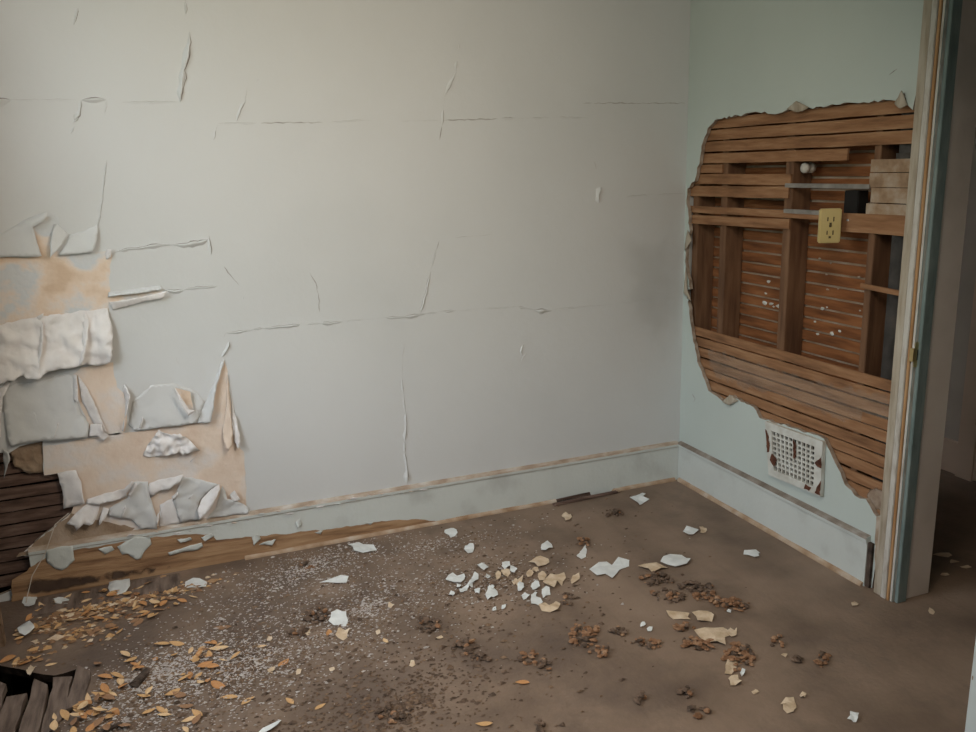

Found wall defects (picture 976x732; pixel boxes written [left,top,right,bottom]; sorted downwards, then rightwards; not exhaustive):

crack [213,79,372,140]
crack [404,43,679,140]
flaking render [0,212,169,325]
crack [115,237,239,285]
crack [223,243,689,337]
flaking render [683,91,914,568]
crack [401,344,409,484]